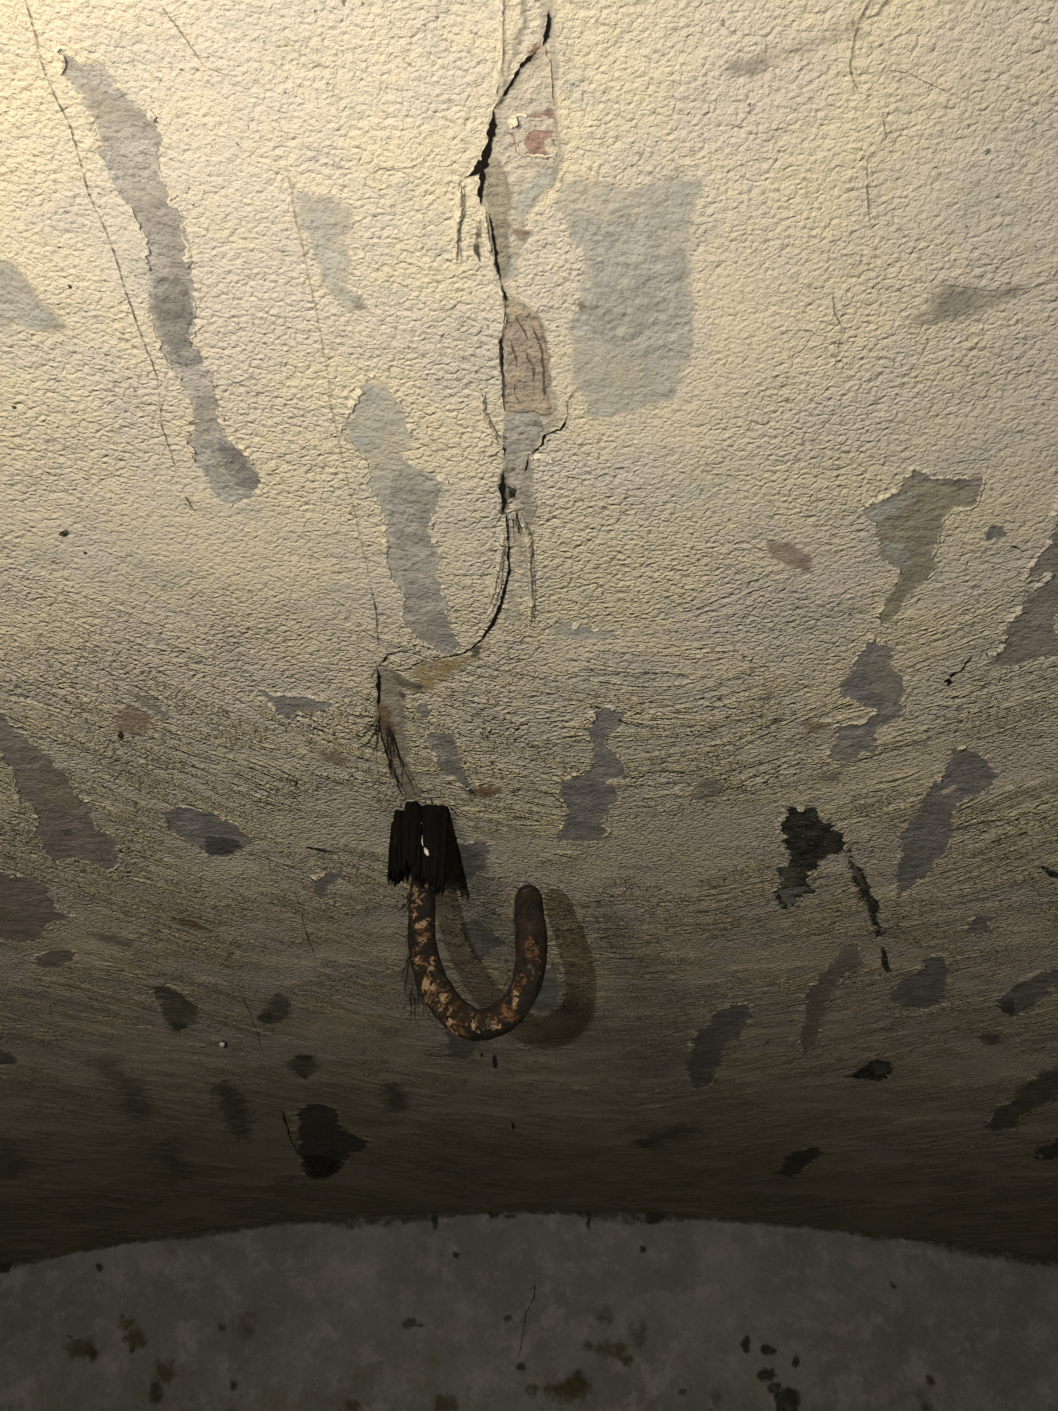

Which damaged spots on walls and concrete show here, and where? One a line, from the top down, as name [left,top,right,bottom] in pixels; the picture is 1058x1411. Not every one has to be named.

crack [361,0,579,705]
flaking render [484,0,562,495]